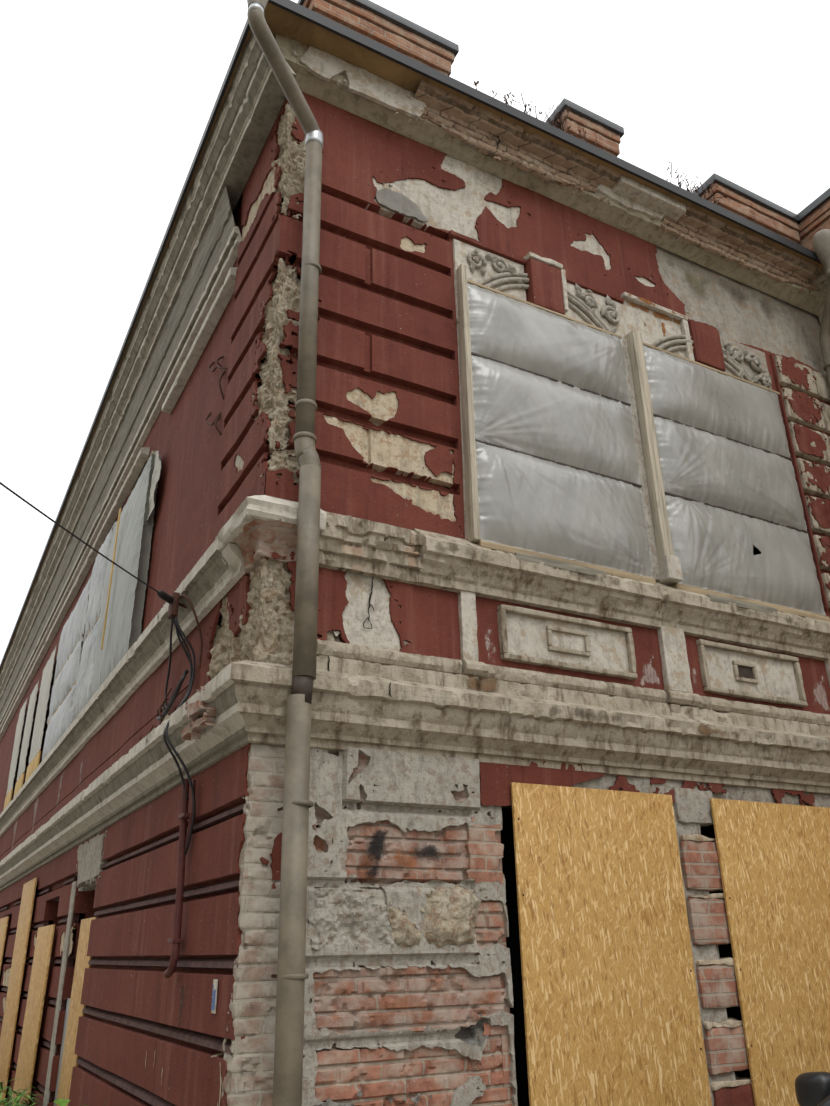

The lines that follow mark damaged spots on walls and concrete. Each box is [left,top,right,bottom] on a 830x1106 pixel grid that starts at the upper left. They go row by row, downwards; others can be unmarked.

spalling [241,103,306,241]
flaking render [365,96,827,376]
spalling [252,258,301,484]
peeling [324,388,460,529]
spalling [152,518,298,741]
peeling [327,572,409,651]
flaking render [308,804,331,853]
flaking render [348,752,368,810]
flaking render [308,816,505,955]
flaking render [451,785,467,803]
flaking render [305,964,511,1106]